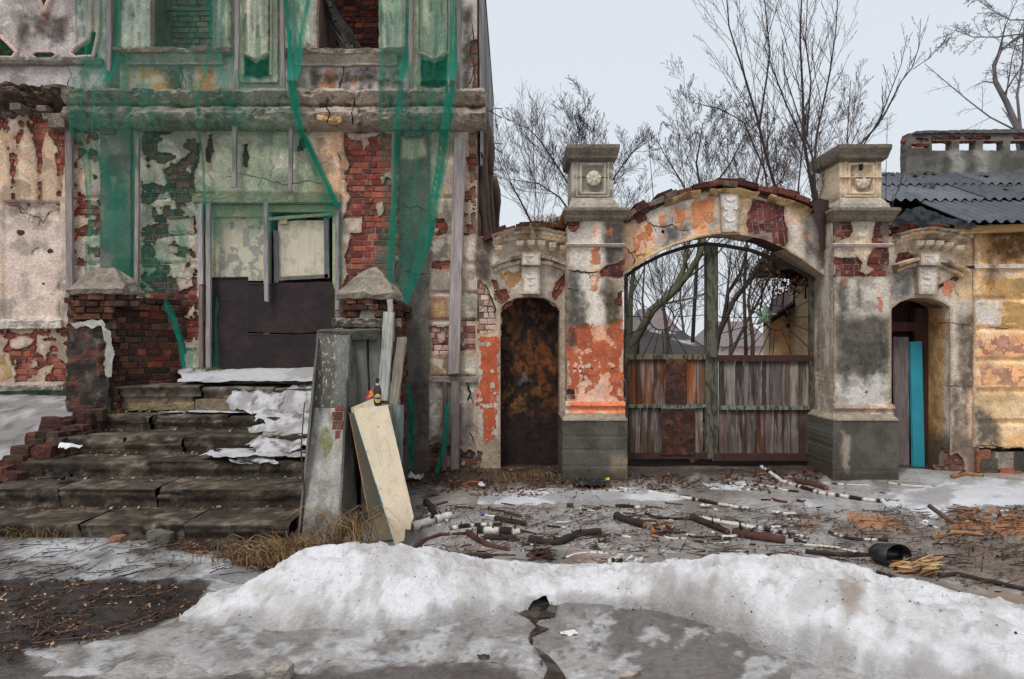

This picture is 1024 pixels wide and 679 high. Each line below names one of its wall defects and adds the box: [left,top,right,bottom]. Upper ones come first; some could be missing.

crack [320,67,360,124]
spalling [0,105,101,266]
spalling [0,319,115,382]
spalling [141,131,214,350]
spalling [329,132,400,318]
peeling [429,269,522,471]
peeling [564,187,721,401]
spalling [738,187,788,251]
spalling [833,222,913,290]
peeling [978,276,1024,387]
spalling [930,447,964,472]